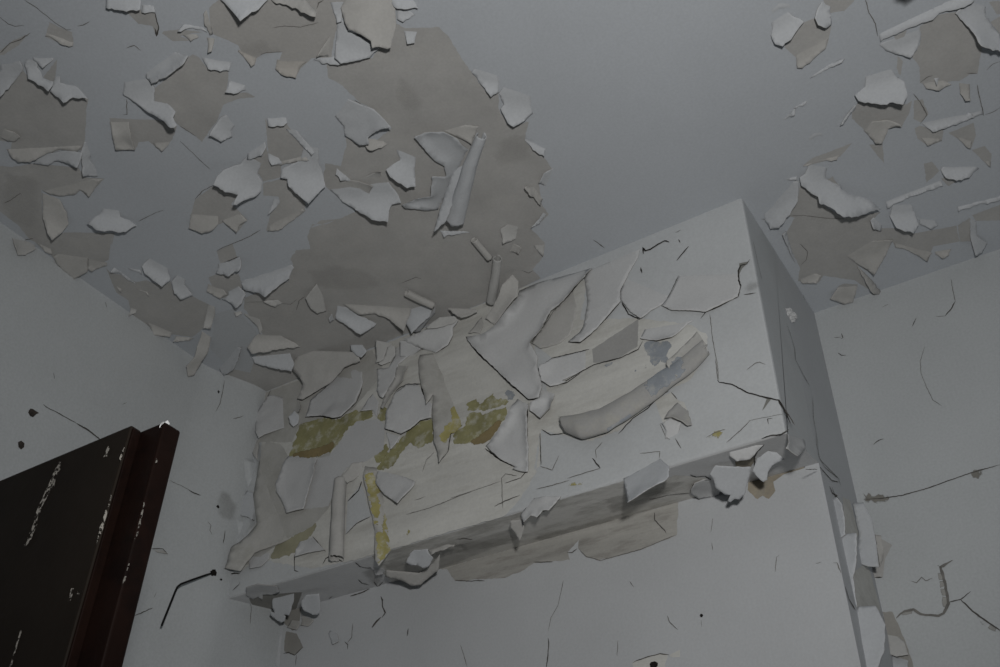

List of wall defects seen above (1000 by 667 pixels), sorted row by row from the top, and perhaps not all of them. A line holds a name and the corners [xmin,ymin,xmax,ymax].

peeling [764,0,1000,295]
peeling [0,0,844,596]
crack [863,465,997,502]
peeling [830,488,913,667]
crack [896,560,1000,631]